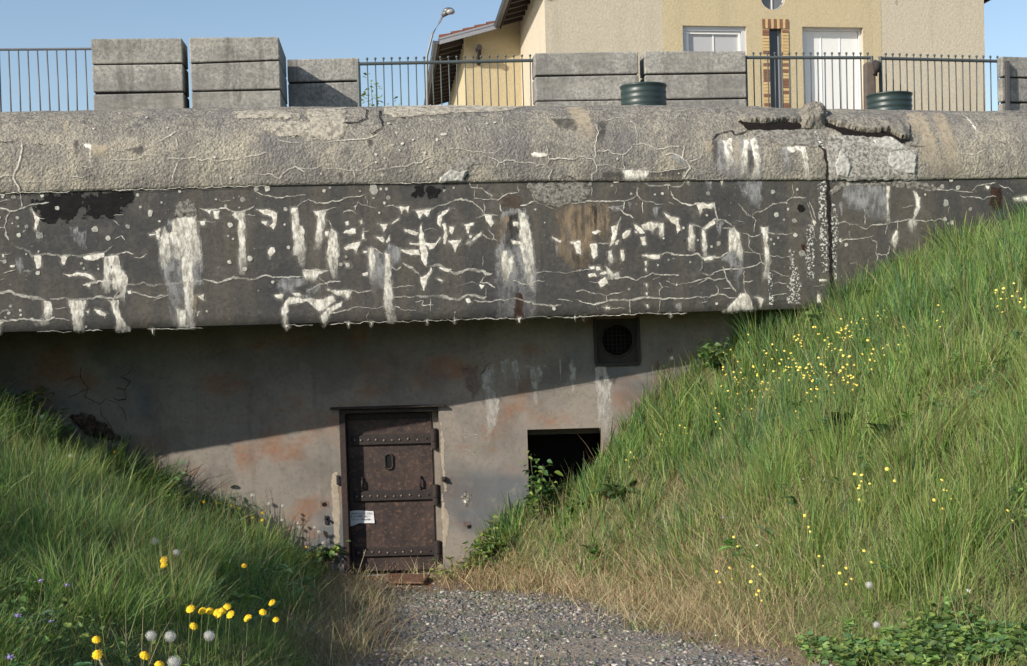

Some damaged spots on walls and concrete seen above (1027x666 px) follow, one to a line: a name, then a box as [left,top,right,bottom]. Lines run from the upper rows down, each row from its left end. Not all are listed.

spalling [712,110,940,196]
crack [937,117,1018,200]
crack [0,140,55,325]
damp [31,190,134,224]
damp [44,253,128,326]
damp [149,205,255,324]
damp [291,207,339,270]
corrosion [514,293,524,322]
crack [112,107,945,313]
corrosion [552,202,623,259]
damp [688,202,743,275]
spalling [70,413,124,442]